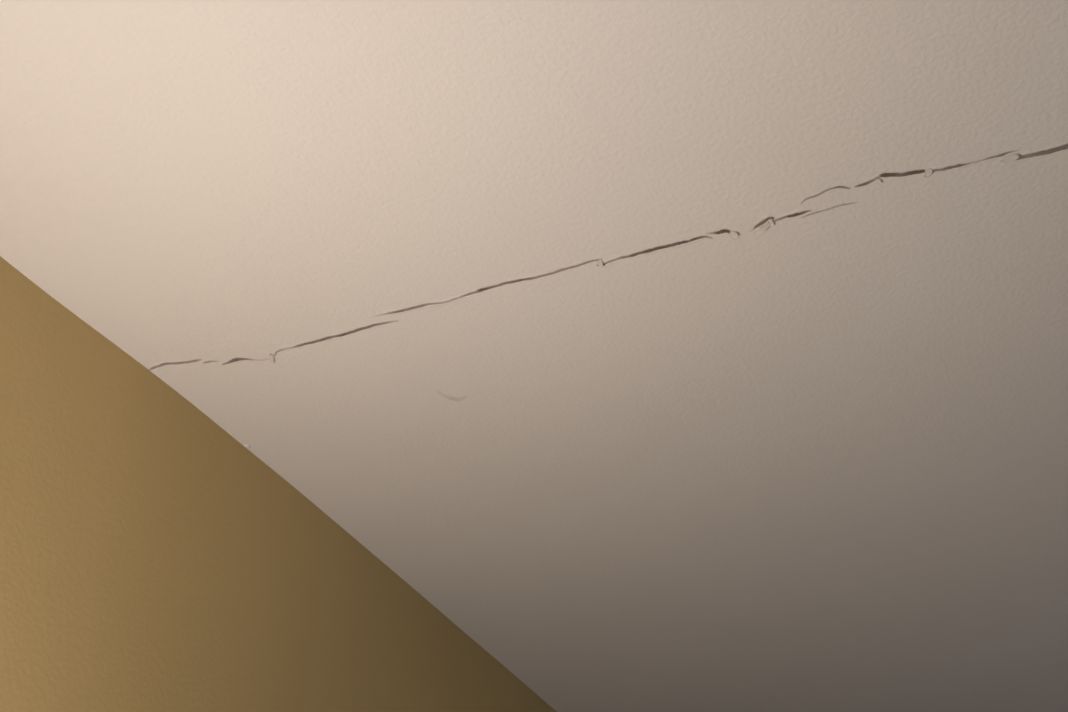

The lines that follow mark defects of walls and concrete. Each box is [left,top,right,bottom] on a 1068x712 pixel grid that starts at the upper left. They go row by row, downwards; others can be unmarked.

crack [837,141,1068,188]
crack [227,209,807,365]